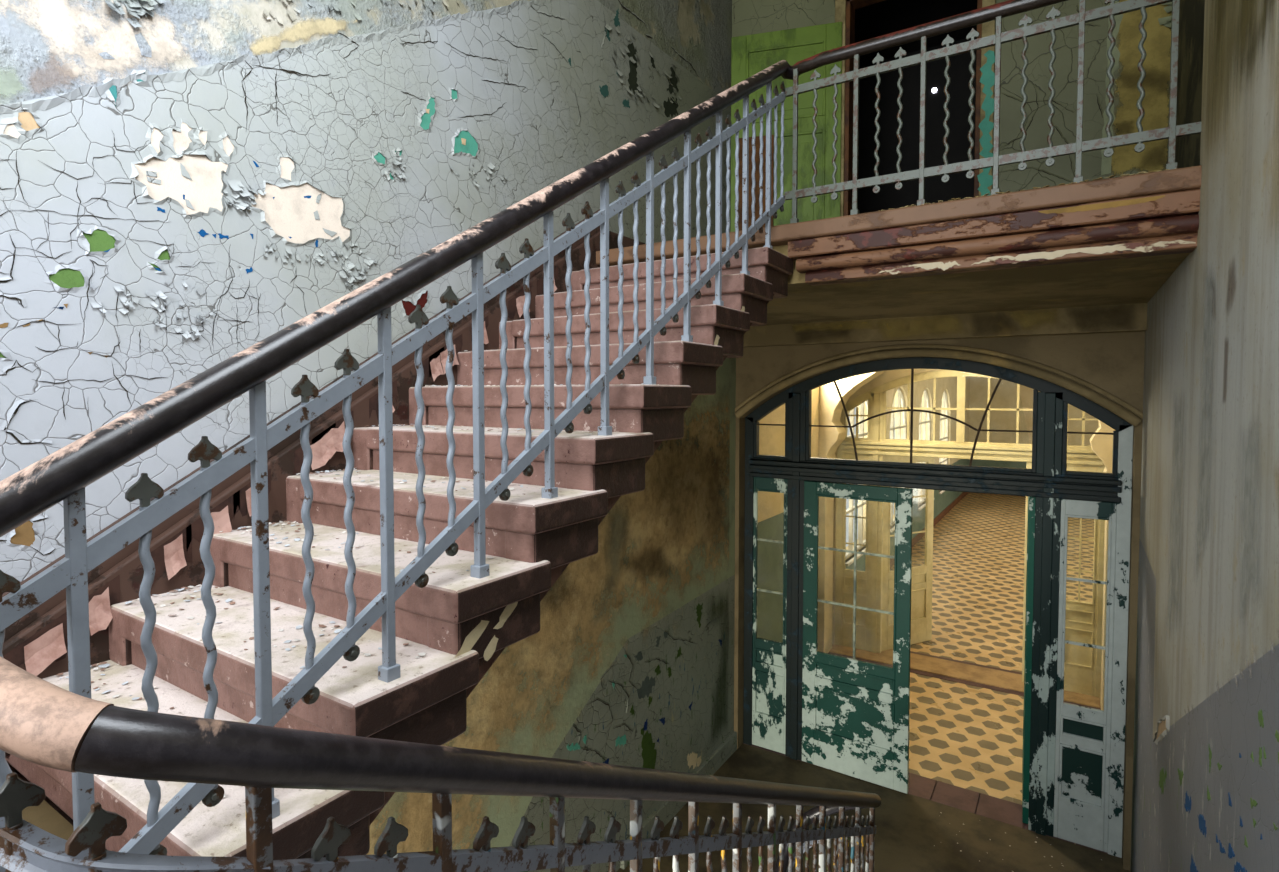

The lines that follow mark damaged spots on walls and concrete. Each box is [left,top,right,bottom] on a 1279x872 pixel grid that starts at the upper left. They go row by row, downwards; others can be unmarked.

peeling [0,0,566,143]
crack [242,32,359,129]
crack [999,84,1104,182]
peeling [129,118,377,290]
peeling [1038,195,1165,214]
peeling [43,224,213,340]
crack [0,129,261,444]
peeling [879,240,1196,275]
crack [0,515,55,556]
damp [443,396,730,752]
damp [366,792,433,855]
damp [452,794,482,849]